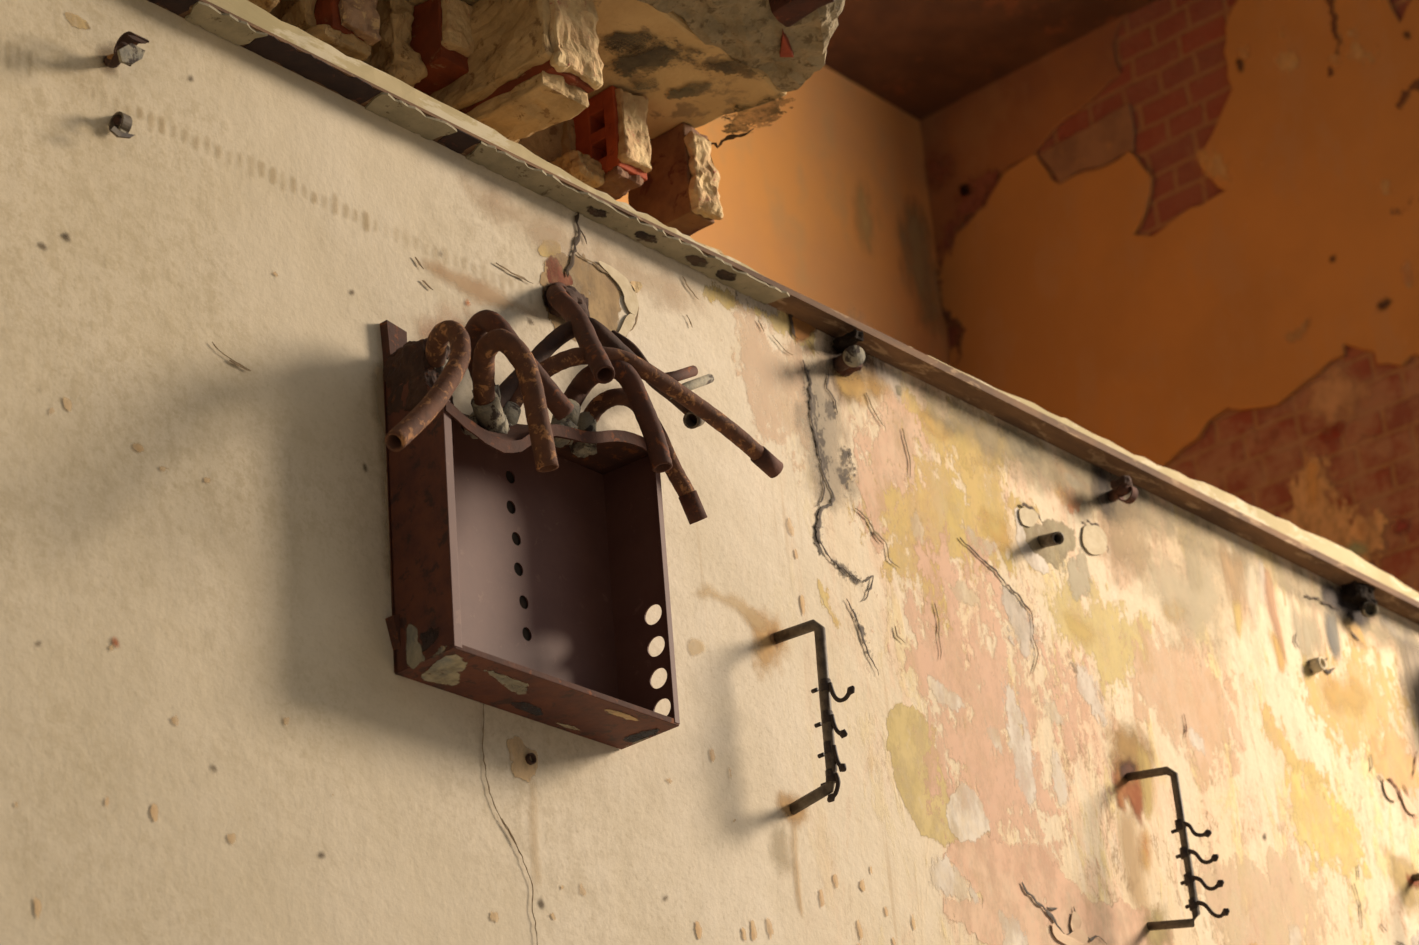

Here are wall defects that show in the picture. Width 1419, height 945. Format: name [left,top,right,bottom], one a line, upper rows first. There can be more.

spalling [602,0,845,134]
crack [1325,0,1342,77]
crack [1396,79,1419,109]
peeling [587,206,607,218]
crack [936,270,966,365]
crack [758,314,911,675]
rust [704,590,783,666]
peeling [817,580,839,627]
crack [934,603,942,659]
crack [960,537,1039,673]
peeling [844,377,1419,945]
crack [482,704,538,945]